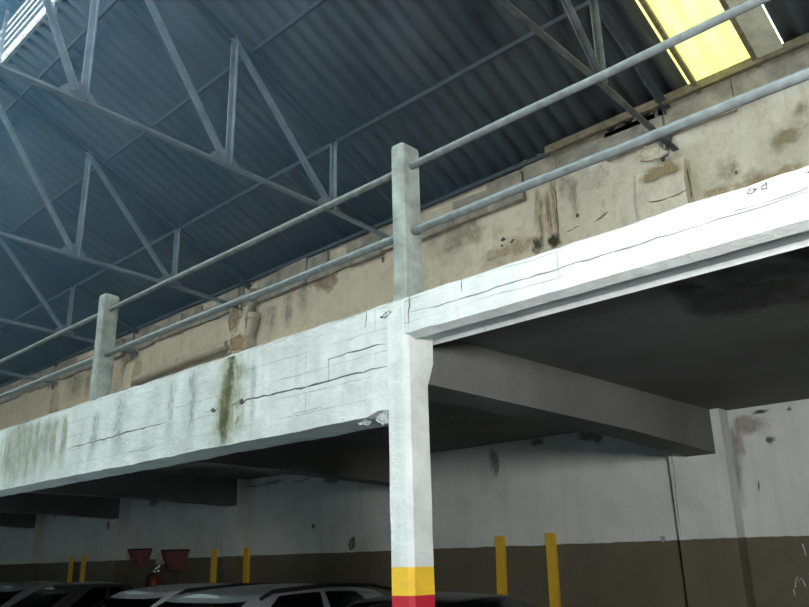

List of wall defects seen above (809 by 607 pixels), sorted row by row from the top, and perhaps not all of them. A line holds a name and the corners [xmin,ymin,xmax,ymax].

crack [647,169,692,203]
crack [408,180,809,323]
peeling [227,304,248,356]
leakage [218,365,241,440]
crack [207,344,387,412]
leakage [6,421,67,472]